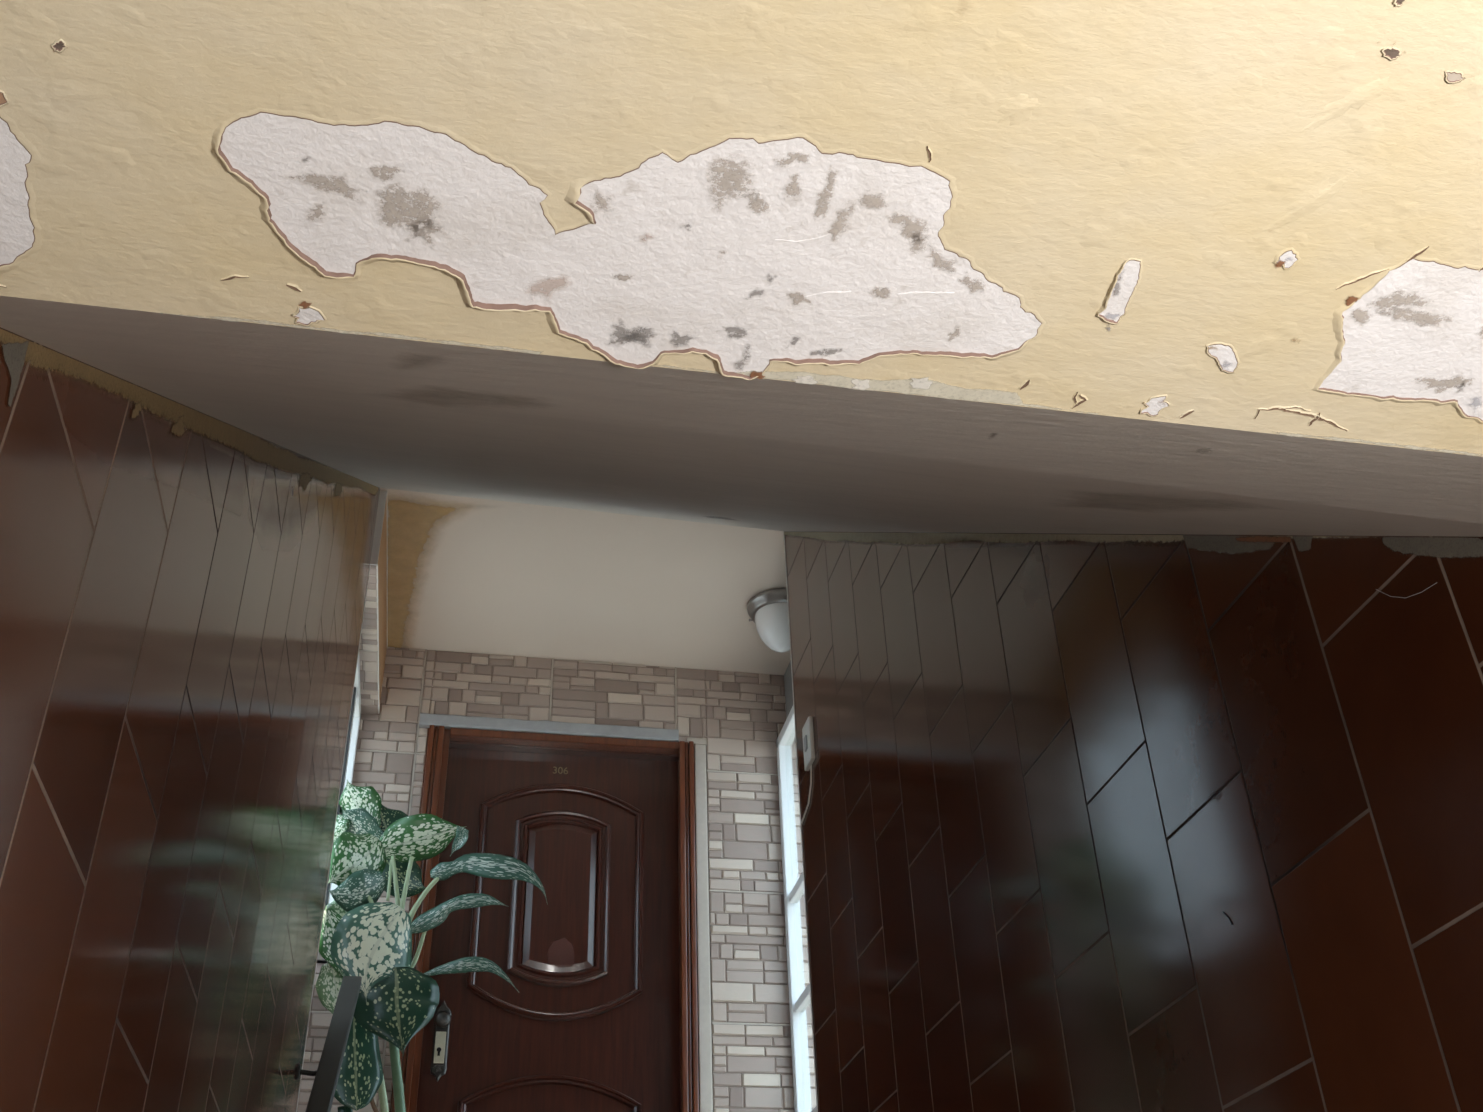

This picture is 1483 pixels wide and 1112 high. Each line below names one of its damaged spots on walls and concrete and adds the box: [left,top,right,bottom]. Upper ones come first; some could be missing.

spalling [51,39,68,53]
peeling [0,90,42,275]
peeling [184,108,1058,409]
peeling [1096,258,1143,331]
peeling [1205,342,1240,374]
peeling [1312,246,1483,424]